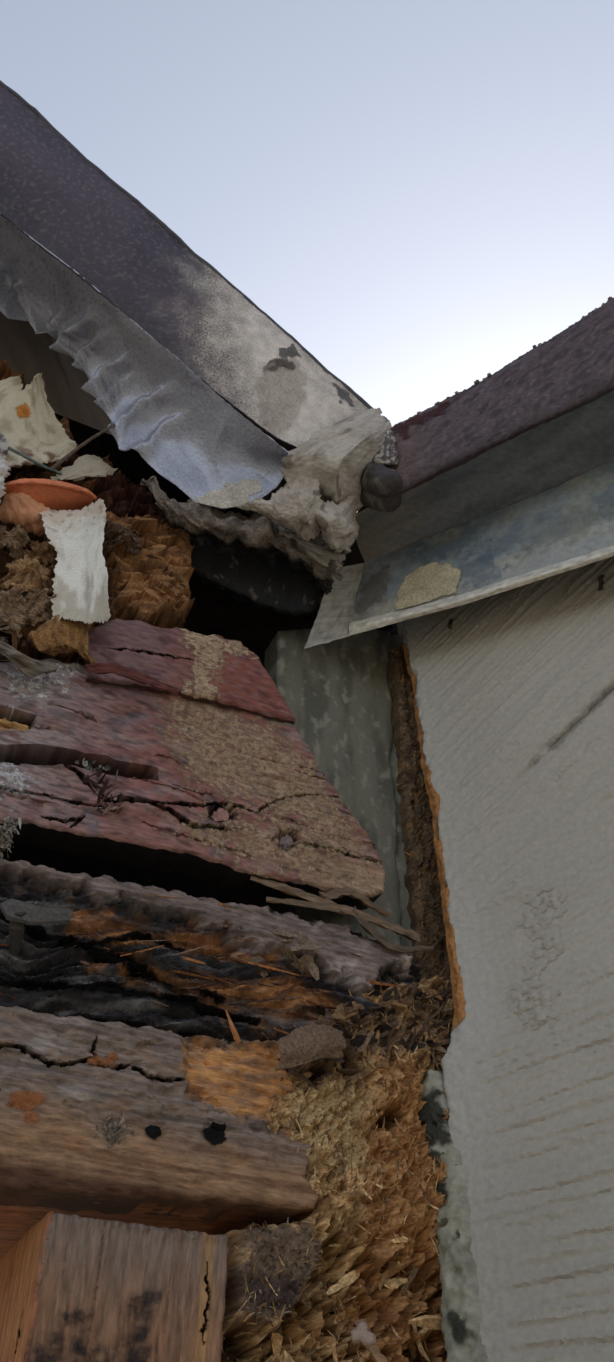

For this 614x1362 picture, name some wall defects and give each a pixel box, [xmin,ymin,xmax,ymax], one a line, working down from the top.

peeling [279,344,301,361]
peeling [0,546,28,598]
crack [110,647,193,661]
crack [3,766,378,864]
peeling [222,643,468,1362]
crack [0,1038,182,1082]
water stain [28,1291,160,1362]